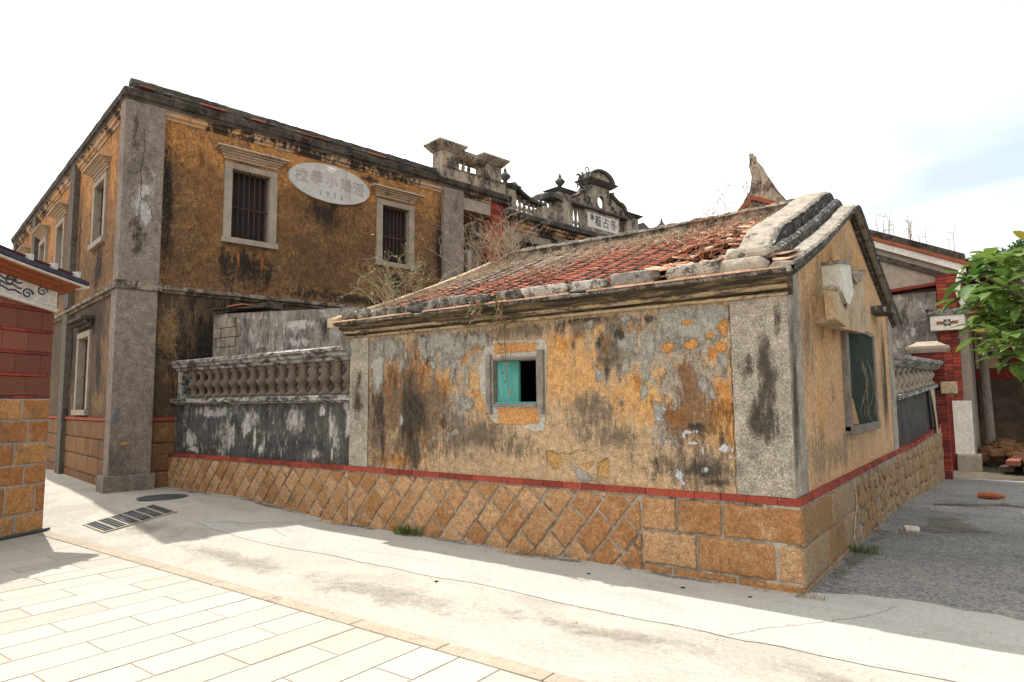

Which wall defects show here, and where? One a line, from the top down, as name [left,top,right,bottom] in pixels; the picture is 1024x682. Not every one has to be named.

crack [129,130,155,217]
peeling [131,163,156,227]
damp [401,361,426,470]
peeling [369,330,493,411]
peeling [615,304,729,426]
damp [739,305,800,468]
spalling [546,451,610,483]